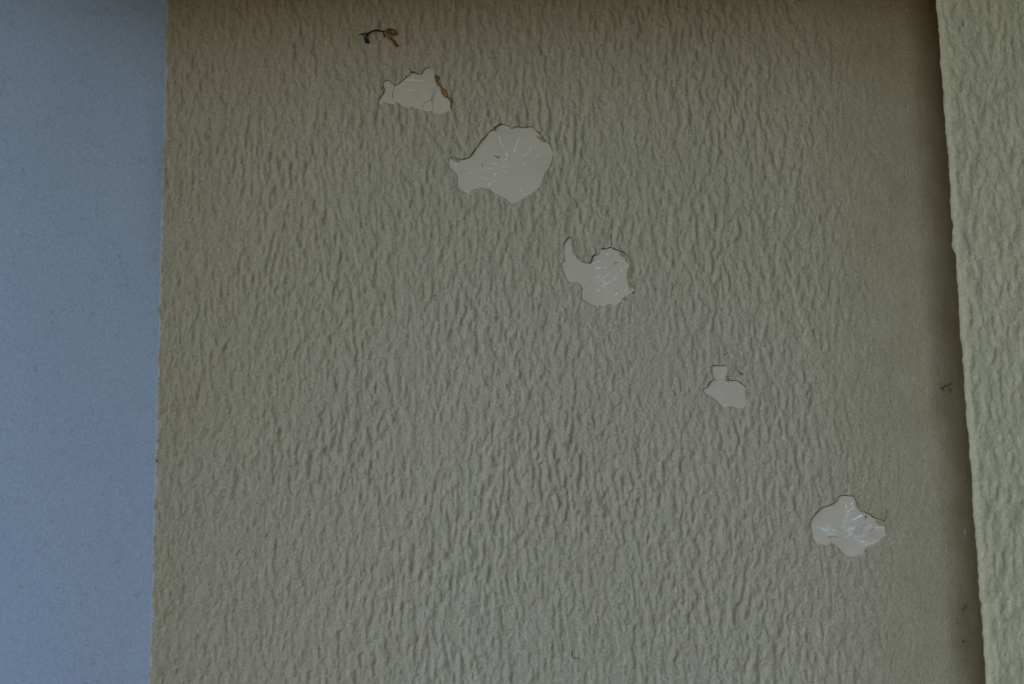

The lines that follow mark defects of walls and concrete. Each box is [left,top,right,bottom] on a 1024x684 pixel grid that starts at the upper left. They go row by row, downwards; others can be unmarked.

peeling [379,68,455,115]
peeling [449,124,554,203]
peeling [562,234,634,306]
peeling [703,365,748,408]
peeling [810,495,887,557]